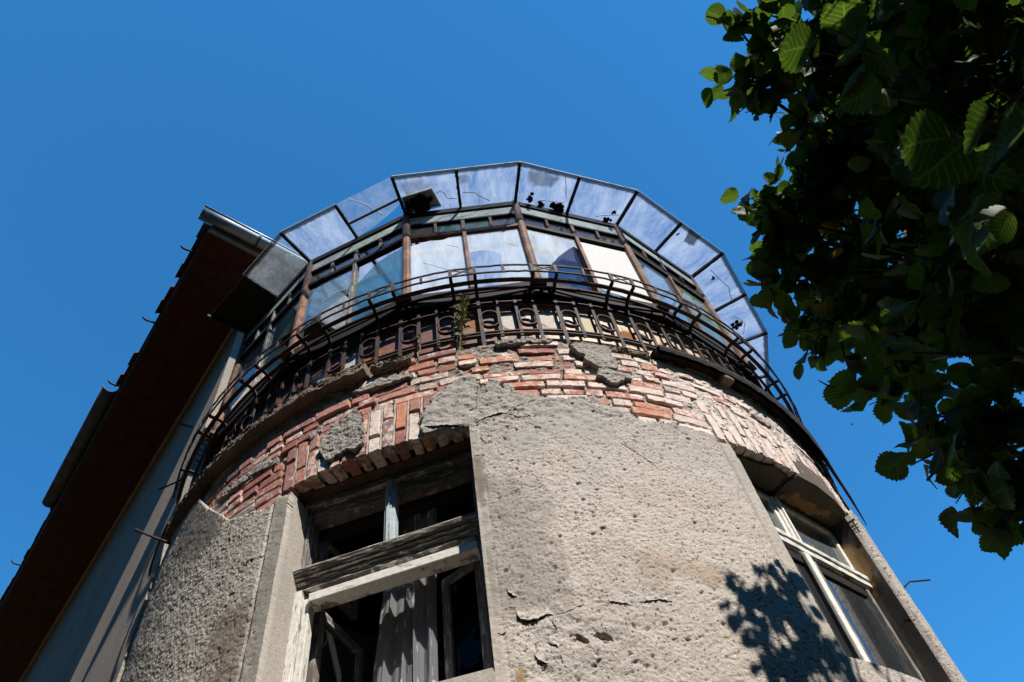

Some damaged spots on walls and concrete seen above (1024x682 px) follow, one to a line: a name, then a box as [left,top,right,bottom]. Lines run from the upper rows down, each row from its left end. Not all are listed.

crack [424,388,547,456]
spalling [185,313,848,519]